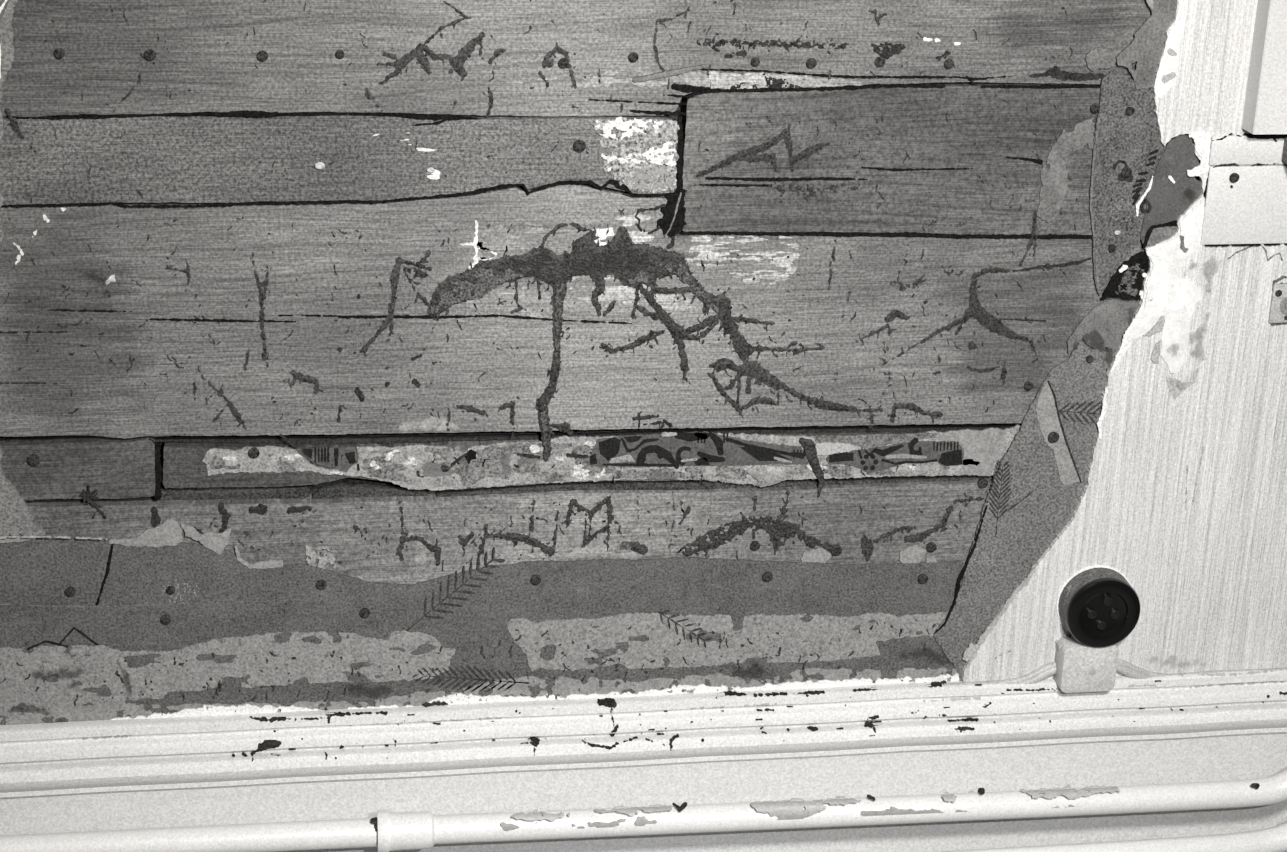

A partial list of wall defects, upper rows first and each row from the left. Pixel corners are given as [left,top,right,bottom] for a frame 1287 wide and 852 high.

peeling [507,67,863,89]
peeling [588,117,680,193]
peeling [460,220,547,269]
peeling [592,211,663,246]
peeling [685,235,800,285]
peeling [569,277,696,312]
damp [400,417,456,430]
crack [95,544,114,605]
peeling [348,673,959,709]
peeling [111,704,322,720]
peeling [500,802,687,831]
peeling [751,792,967,820]